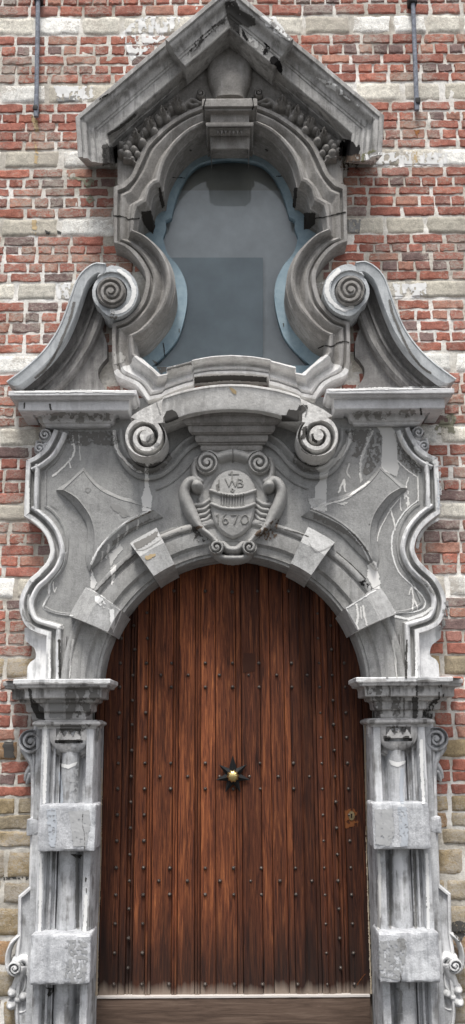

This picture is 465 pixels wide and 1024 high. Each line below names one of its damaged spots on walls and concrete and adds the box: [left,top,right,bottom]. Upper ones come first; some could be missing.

leakage [366,639,425,804]